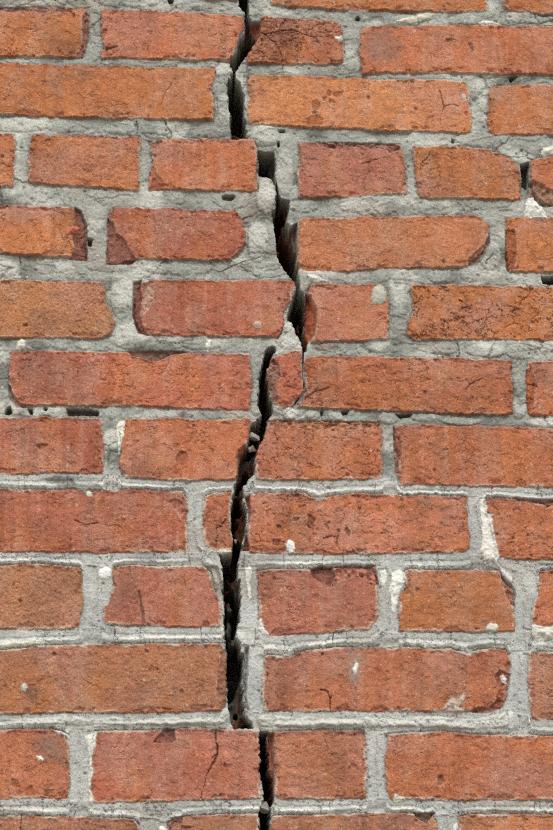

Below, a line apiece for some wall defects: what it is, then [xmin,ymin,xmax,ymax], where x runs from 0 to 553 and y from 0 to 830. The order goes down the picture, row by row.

crack [228,0,335,140]
crack [211,153,331,405]
crack [201,350,281,830]
crack [320,689,333,712]